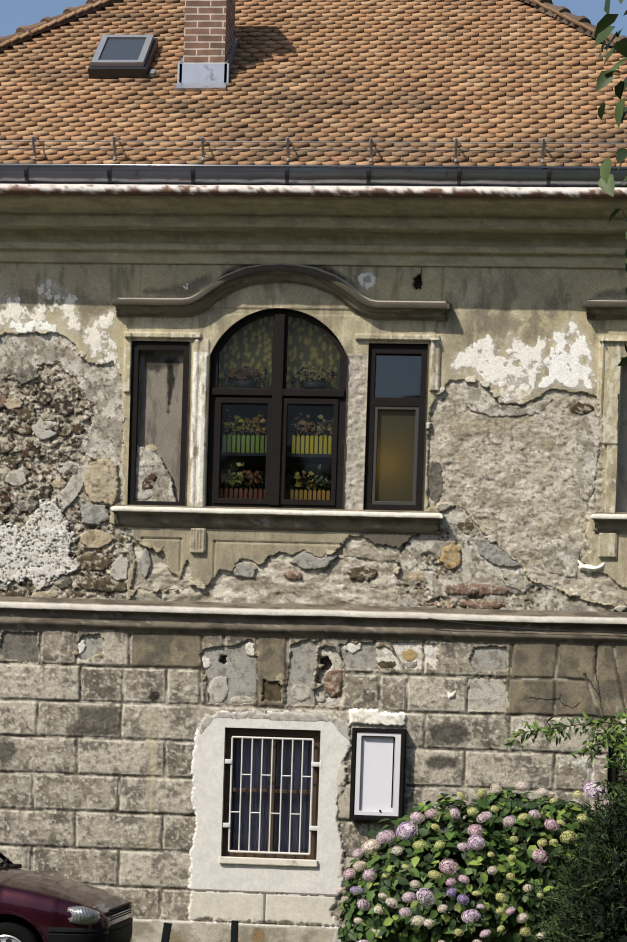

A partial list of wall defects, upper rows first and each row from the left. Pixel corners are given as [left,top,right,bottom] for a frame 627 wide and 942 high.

spalling [0,278,627,612]
spalling [200,639,438,711]